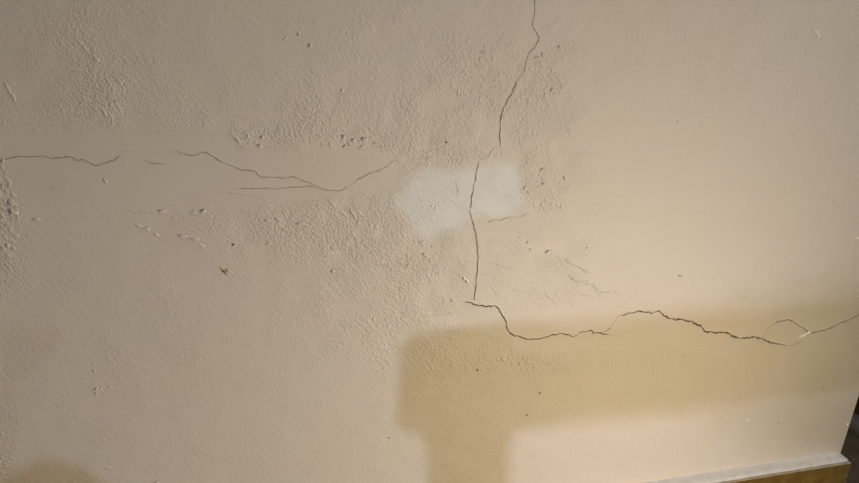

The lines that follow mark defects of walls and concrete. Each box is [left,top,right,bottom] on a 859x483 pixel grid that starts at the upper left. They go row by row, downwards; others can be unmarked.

crack [0,149,400,191]
crack [445,0,859,346]